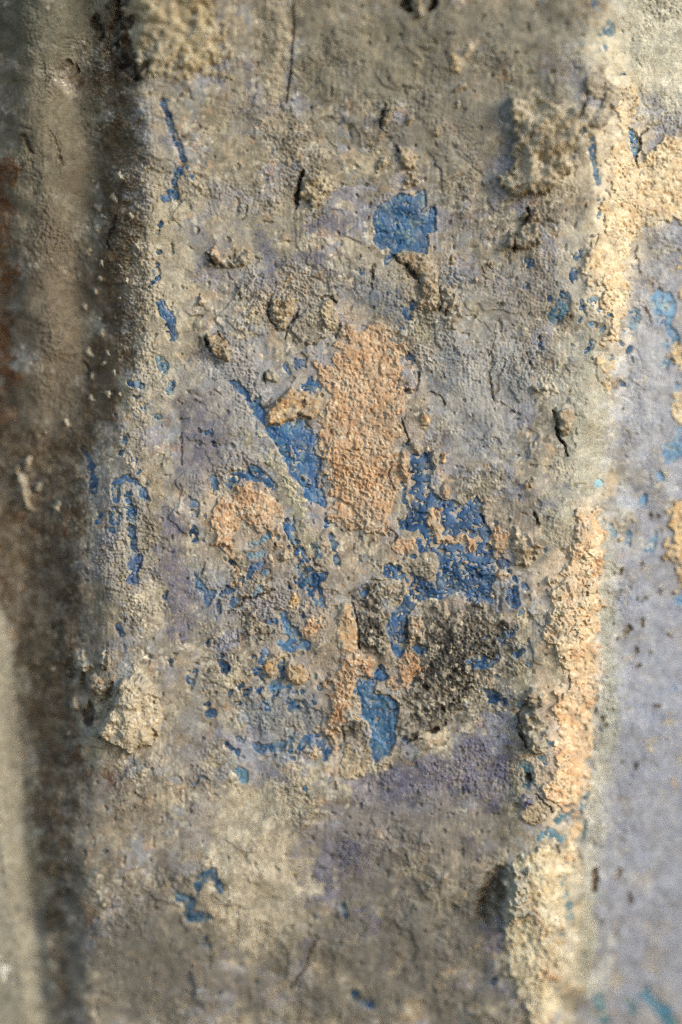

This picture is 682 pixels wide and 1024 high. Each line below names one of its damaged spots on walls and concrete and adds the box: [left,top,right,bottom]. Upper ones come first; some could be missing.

flaking render [580,76,682,392]
flaking render [189,316,447,590]
crack [552,410,568,456]
flaking render [669,392,682,426]
flaking render [426,484,513,564]
flaking render [619,498,682,601]
flaking render [433,599,451,620]
flaking render [502,505,644,1024]